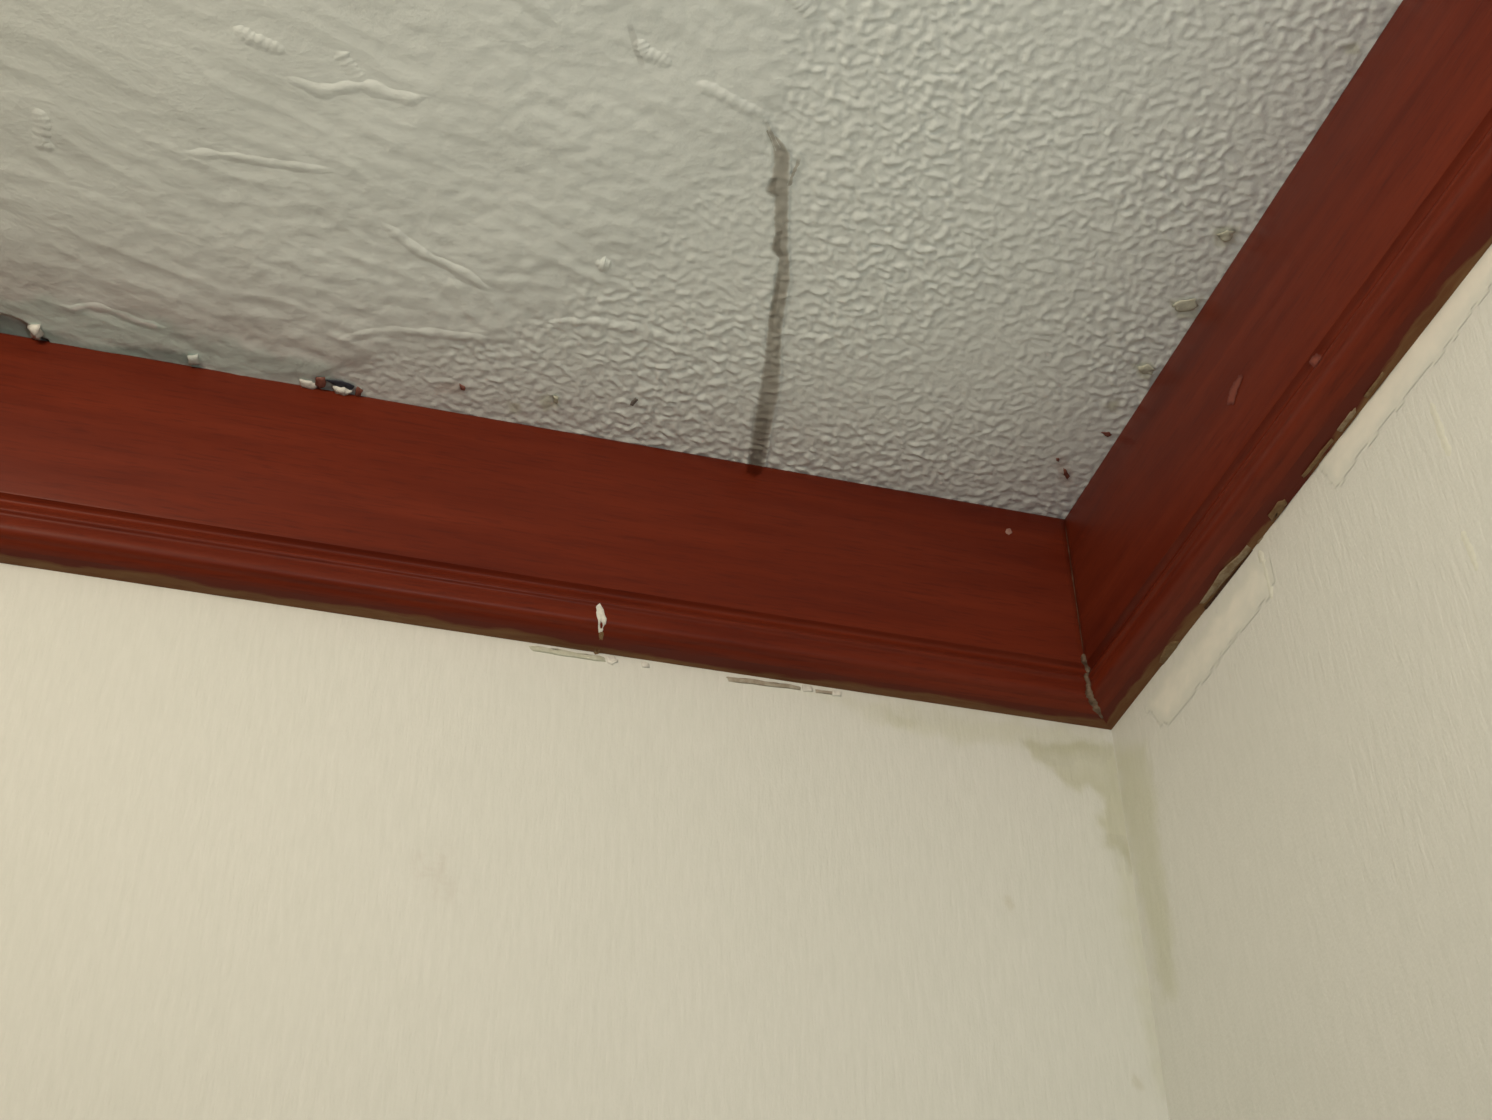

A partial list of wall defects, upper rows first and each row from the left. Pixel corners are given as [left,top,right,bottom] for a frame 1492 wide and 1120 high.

spalling [299,377,363,397]